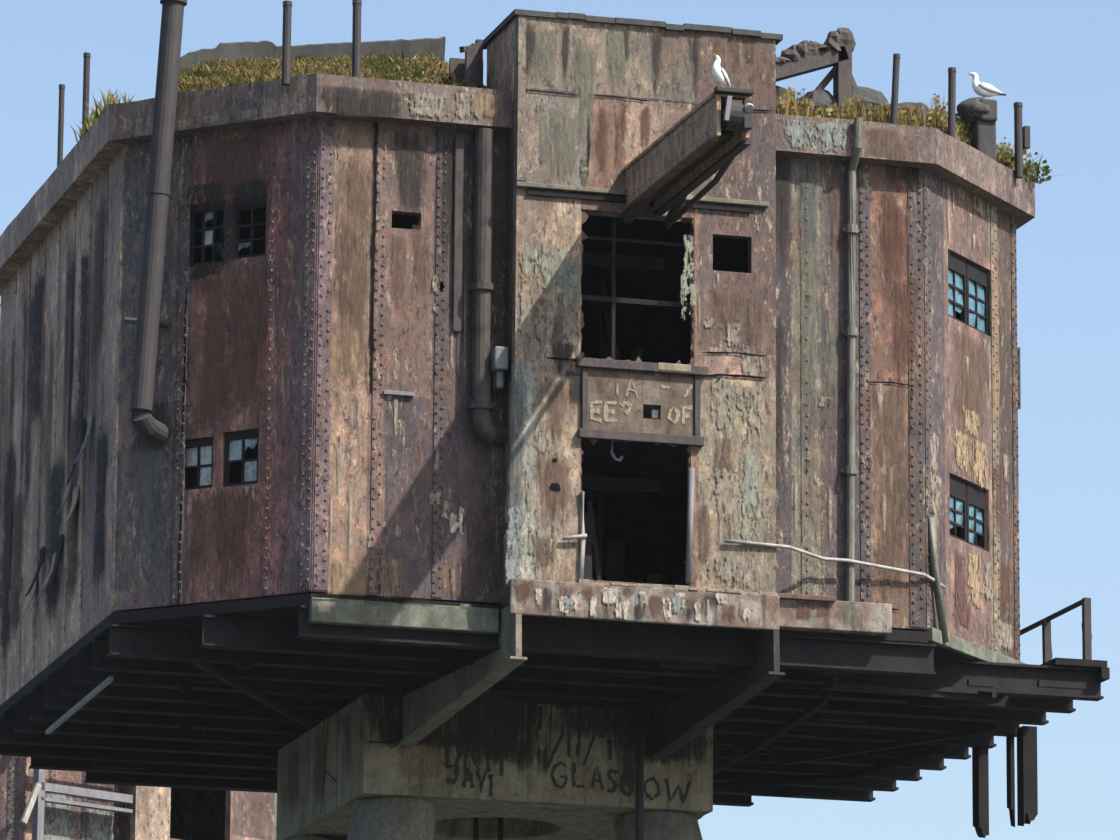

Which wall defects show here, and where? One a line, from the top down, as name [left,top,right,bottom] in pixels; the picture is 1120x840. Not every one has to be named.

peeling [428,491,464,534]
leakage [352,687,706,790]